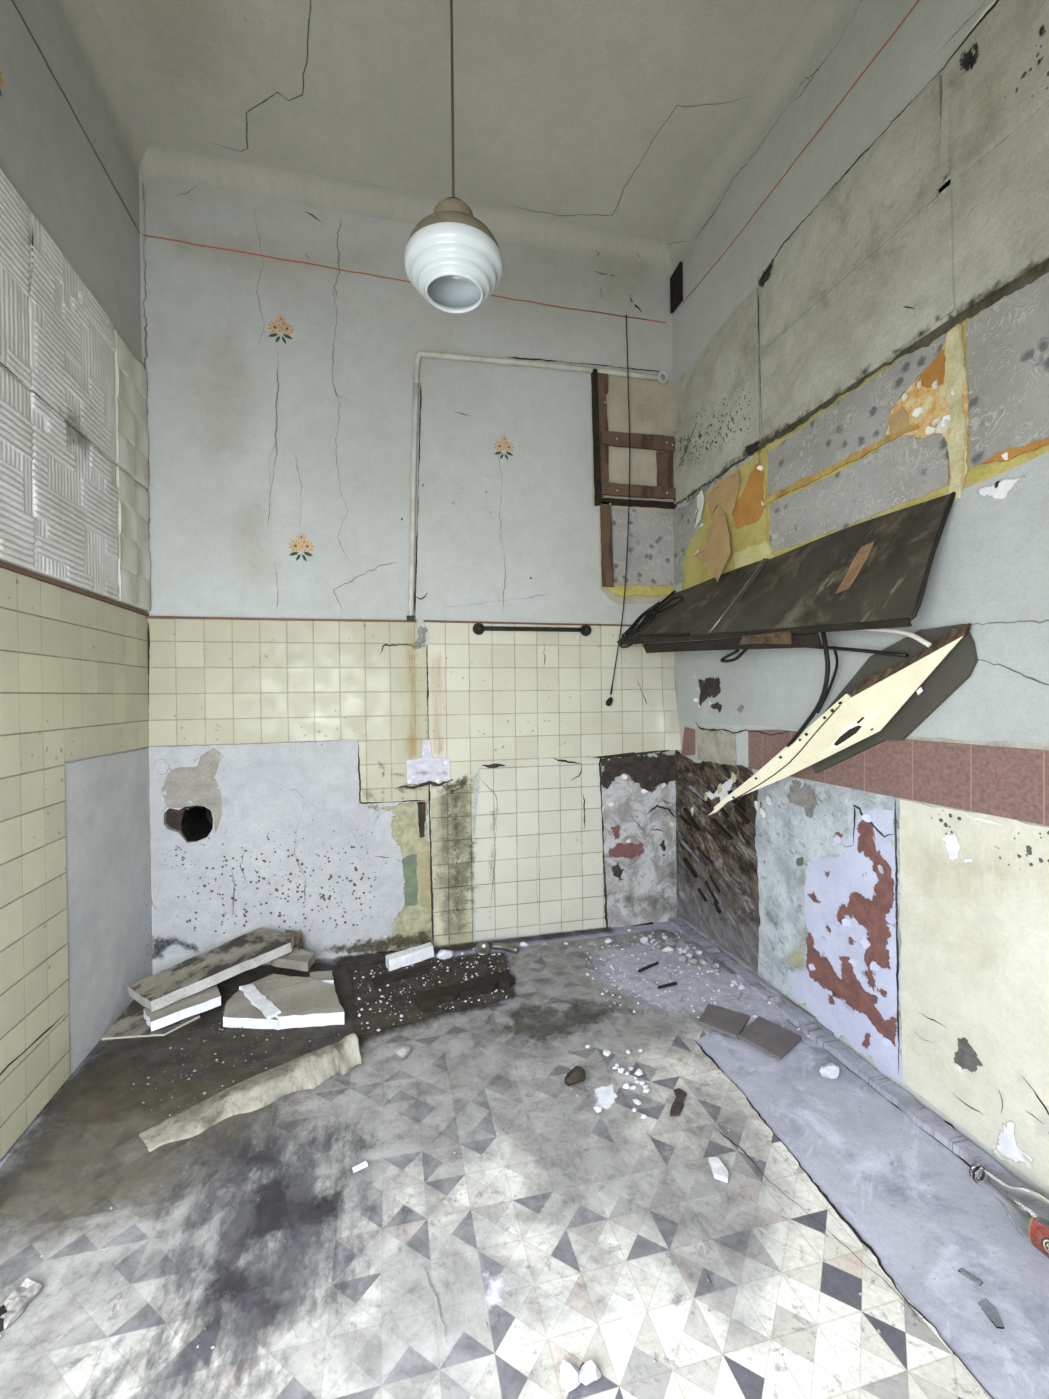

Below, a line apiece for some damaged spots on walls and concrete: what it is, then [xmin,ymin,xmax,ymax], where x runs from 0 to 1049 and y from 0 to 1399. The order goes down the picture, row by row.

crack [210,0,312,152]
leakage [960,42,979,72]
leakage [1005,25,1049,103]
crack [508,96,752,216]
crack [254,213,303,527]
crack [306,212,397,609]
peeling [885,323,1031,500]
peeling [681,455,774,591]
flaking render [161,748,223,841]
flaking render [599,752,676,806]
leakage [0,776,613,1225]
peeling [806,814,897,1050]